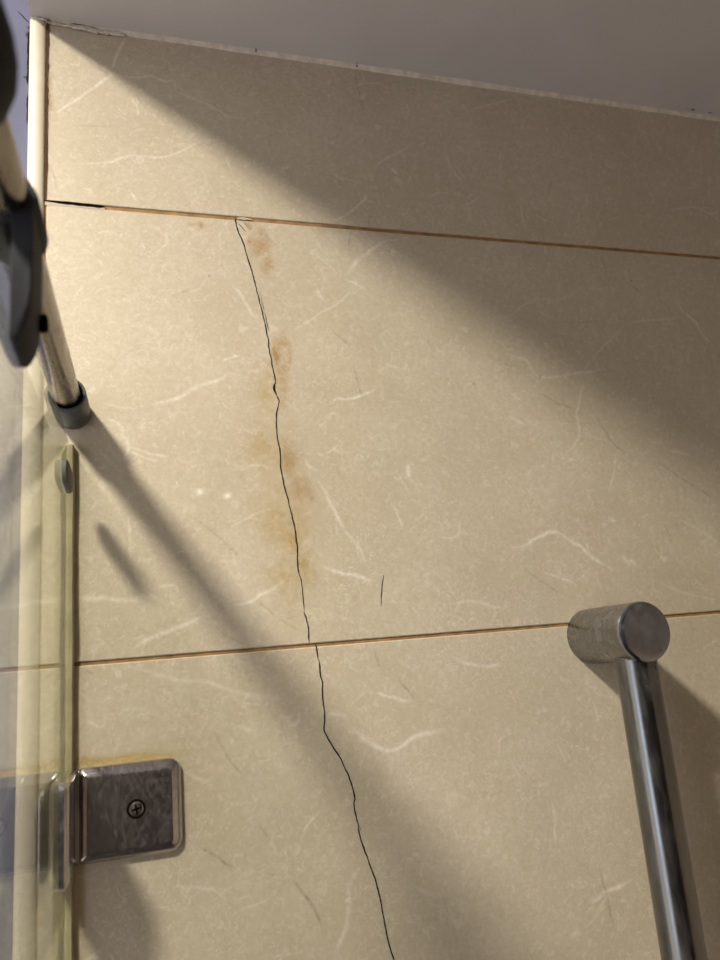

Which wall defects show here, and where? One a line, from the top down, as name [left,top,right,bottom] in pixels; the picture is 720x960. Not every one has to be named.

crack [235,218,394,960]